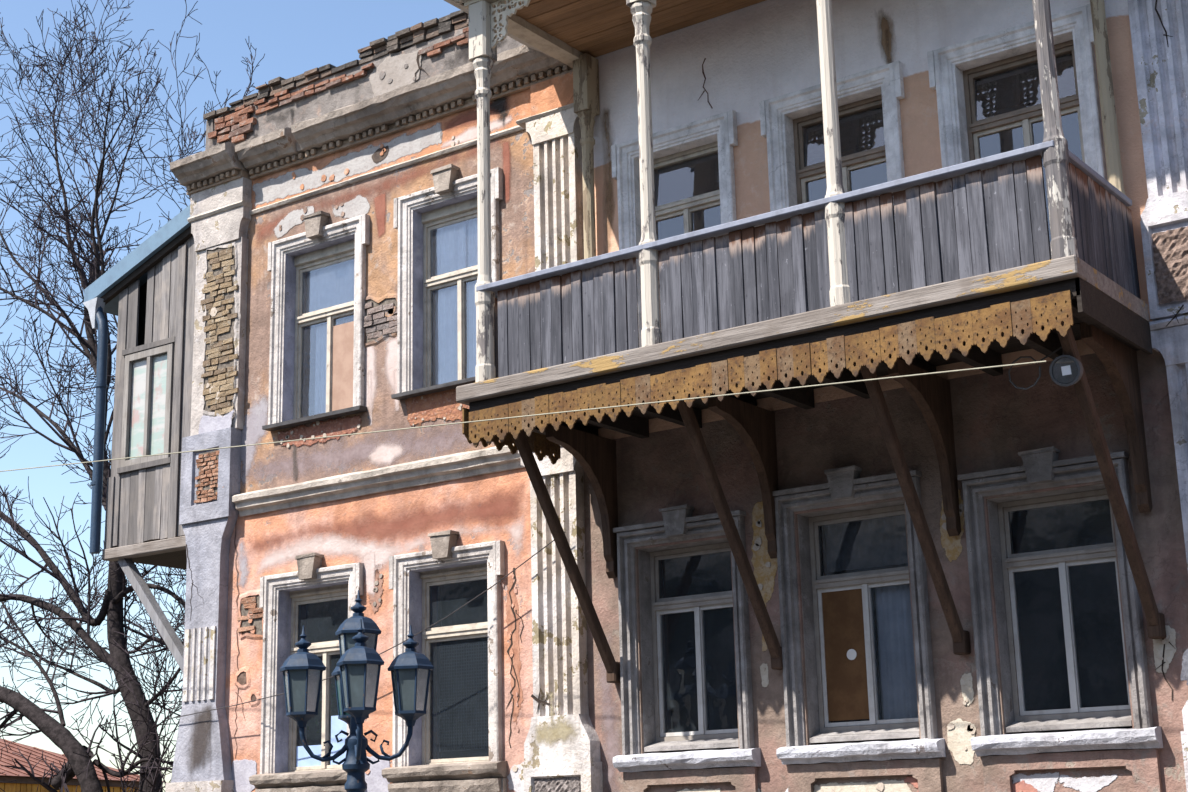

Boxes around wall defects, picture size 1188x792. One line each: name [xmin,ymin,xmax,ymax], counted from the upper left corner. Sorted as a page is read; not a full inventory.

crack [1155,0,1173,47]
flaking render [208,63,393,146]
crack [698,58,713,108]
flaking render [200,241,241,417]
flaking render [363,293,398,348]
flaking render [194,450,223,503]
flaking render [237,589,264,640]
crack [506,568,551,748]
peeling [1153,625,1188,686]
peeling [947,673,976,765]
peeling [814,776,918,792]
peeling [1012,772,1117,792]